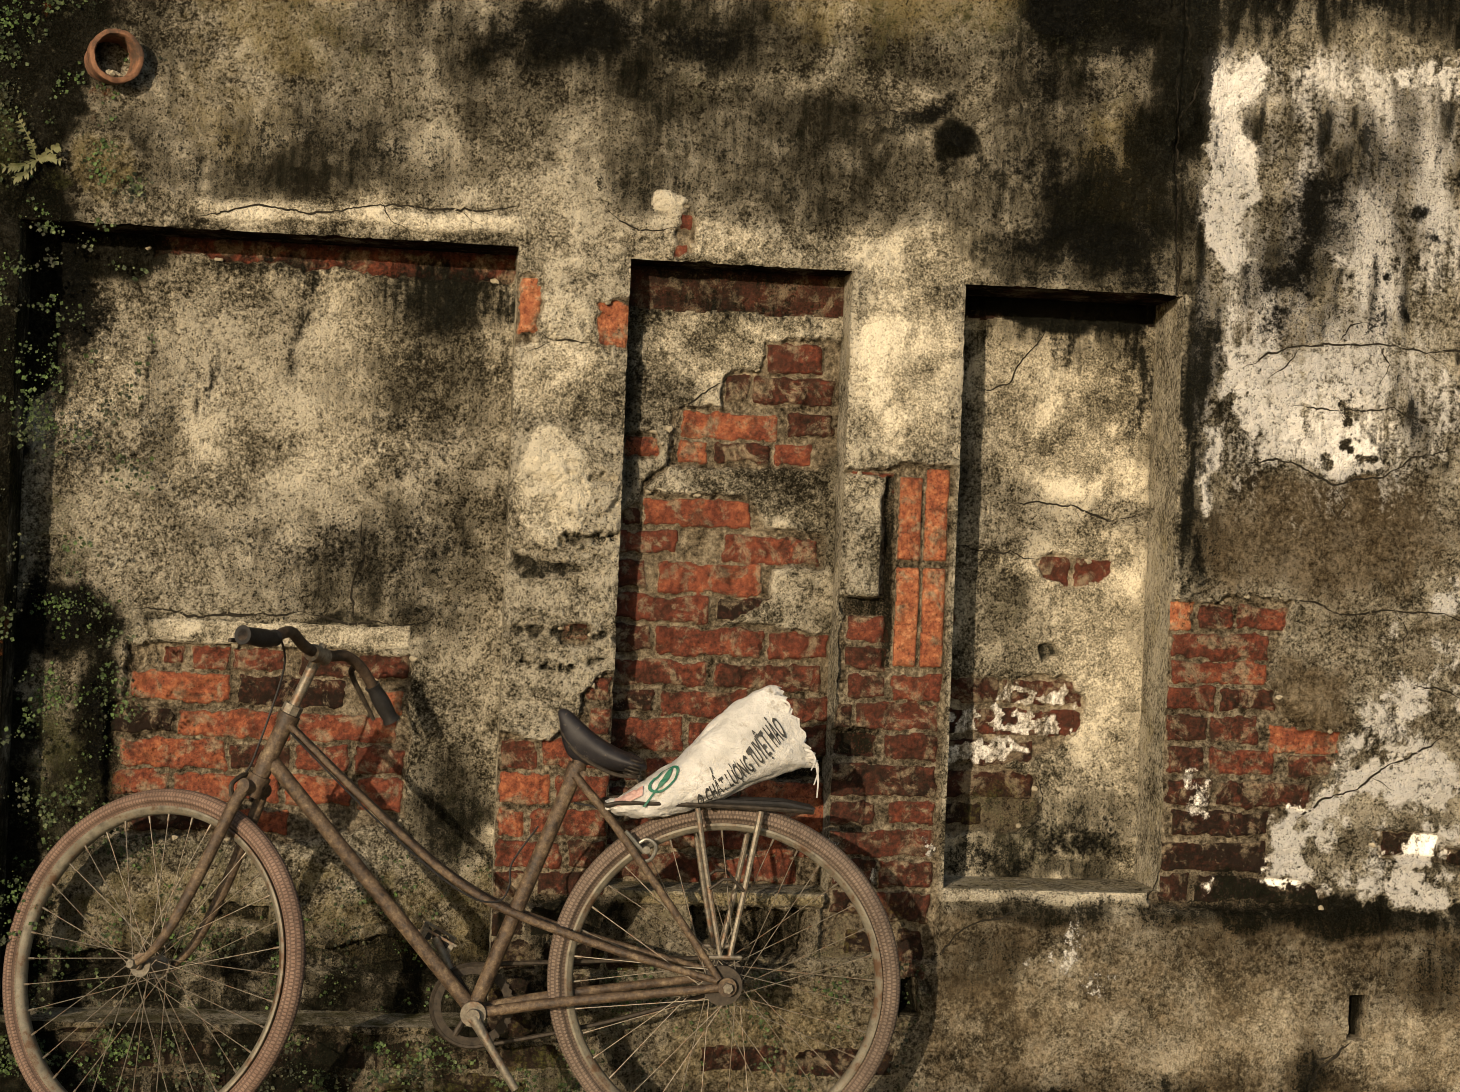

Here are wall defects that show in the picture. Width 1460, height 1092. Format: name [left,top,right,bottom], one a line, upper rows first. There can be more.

leakage [474,0,775,88]
leakage [898,94,980,187]
crack [196,201,516,230]
leakage [963,0,1460,619]
crack [1242,322,1460,522]
spalling [1034,549,1114,591]
spalling [493,336,1088,964]
crack [1289,599,1460,698]
spalling [103,640,419,847]
spalling [1146,571,1460,917]
leakage [1149,1075,1181,1092]